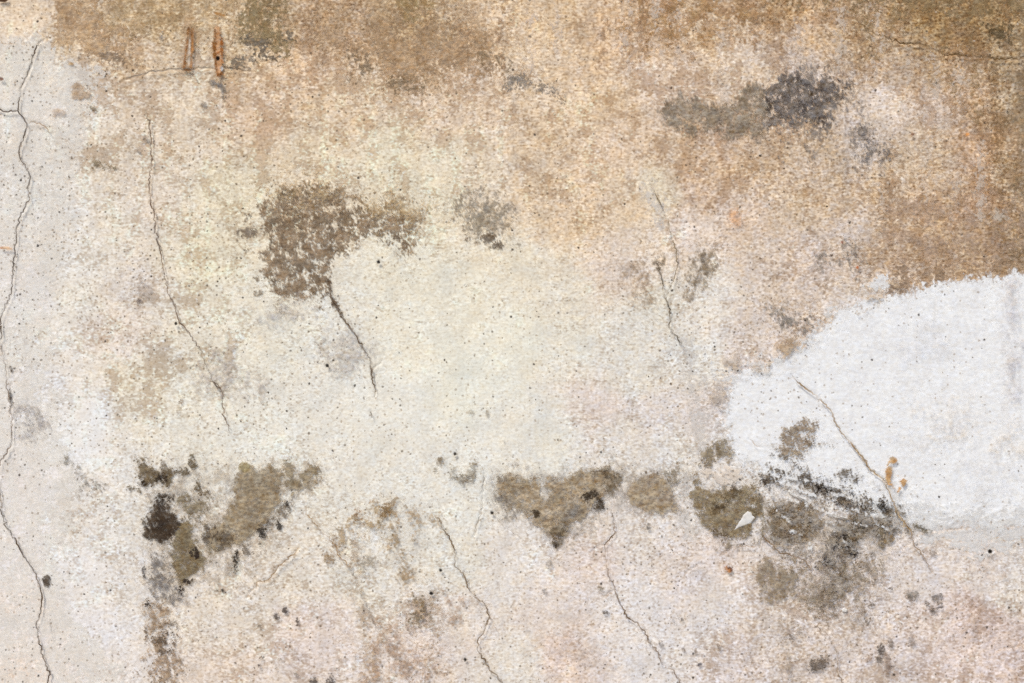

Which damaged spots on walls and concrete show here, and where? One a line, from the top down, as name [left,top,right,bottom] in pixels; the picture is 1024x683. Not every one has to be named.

corrosion [183,27,194,71]
corrosion [212,12,225,77]
leakage [656,56,902,175]
crack [0,45,49,466]
crack [146,115,229,430]
leakage [236,173,428,327]
crack [329,288,376,416]
crack [0,493,51,683]
leakage [126,454,322,683]
leakage [494,338,932,683]
crack [796,380,929,568]
corrosion [885,457,907,493]